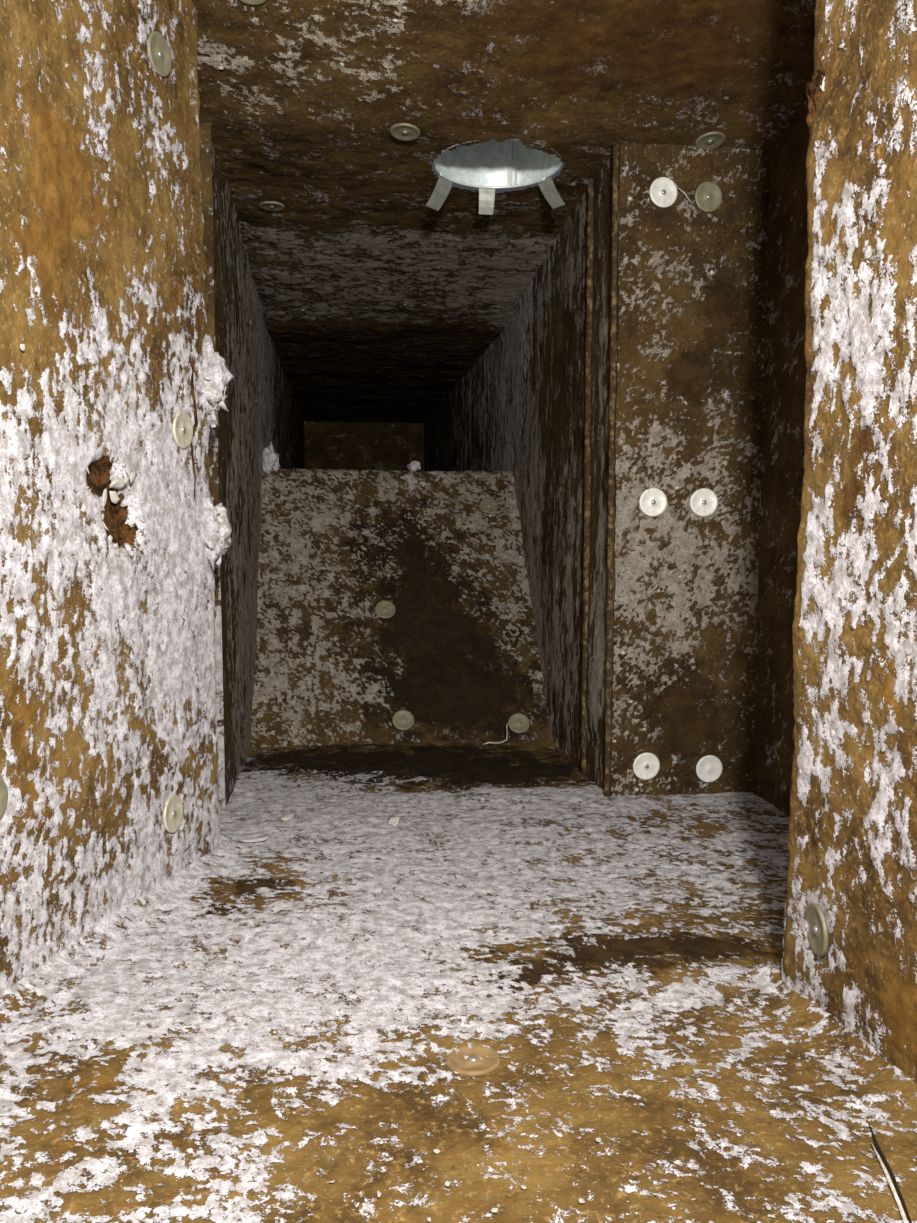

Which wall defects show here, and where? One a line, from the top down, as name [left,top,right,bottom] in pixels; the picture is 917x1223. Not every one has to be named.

damp [814,0,916,175]
damp [0,0,117,317]
peeling [80,467,118,549]
damp [878,634,906,731]
damp [9,668,50,830]
damp [205,878,296,915]
damp [473,871,917,1083]
damp [63,1072,129,1090]
damp [57,1141,83,1151]